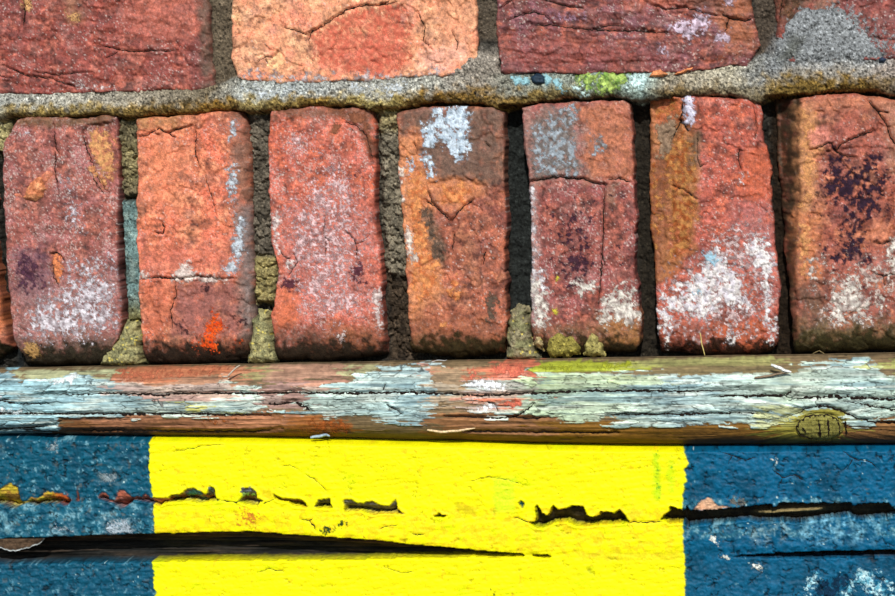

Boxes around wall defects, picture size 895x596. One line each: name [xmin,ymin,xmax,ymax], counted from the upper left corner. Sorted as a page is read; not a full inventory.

crack [284,1,397,47]
crack [816,102,895,157]
crack [142,126,216,212]
leakage [529,186,552,351]
crack [532,176,630,310]
leakage [570,278,642,353]
leakage [656,206,779,356]
leakage [792,238,895,353]
peeling [99,487,216,535]
peeling [344,500,402,515]
peeling [530,506,629,528]
peeling [663,496,895,525]